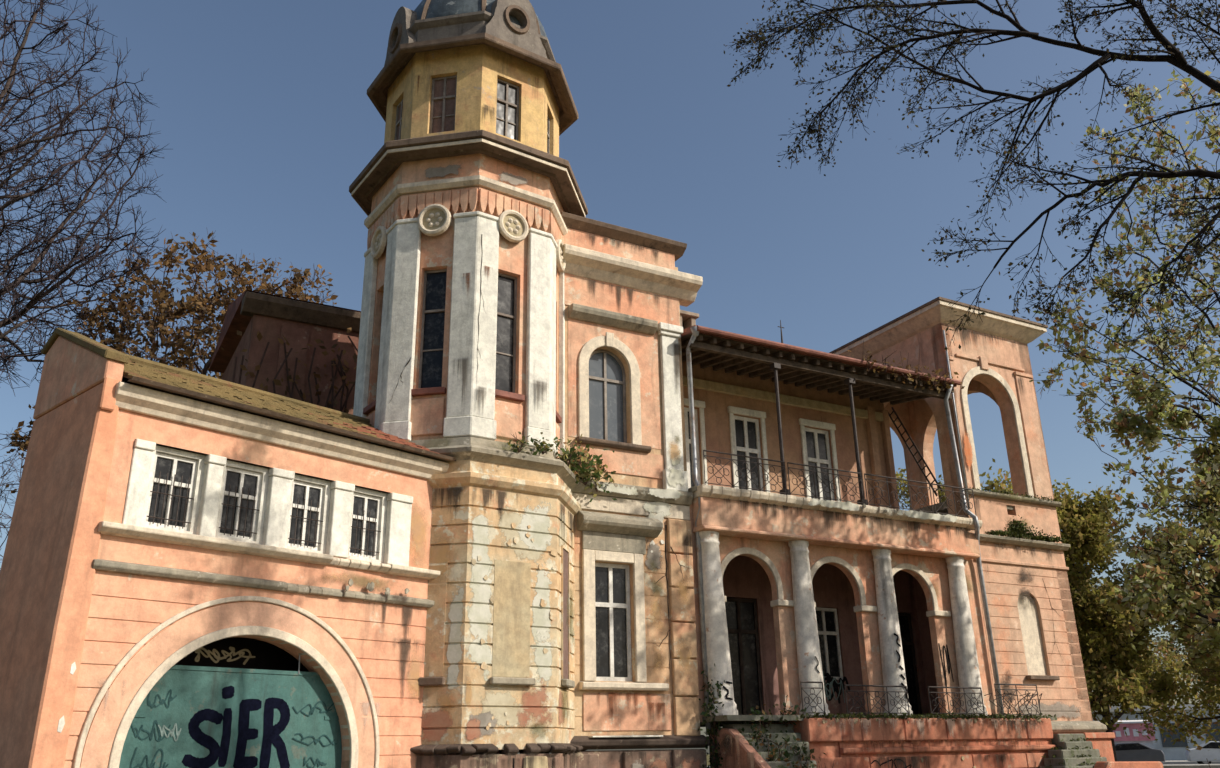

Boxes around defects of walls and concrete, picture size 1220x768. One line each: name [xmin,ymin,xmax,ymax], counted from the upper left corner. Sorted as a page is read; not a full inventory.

leakage [453,359,486,408]
leakage [739,500,802,515]
leakage [823,510,883,527]
leakage [910,521,967,537]
peeling [421,502,567,742]
leakage [398,607,420,691]